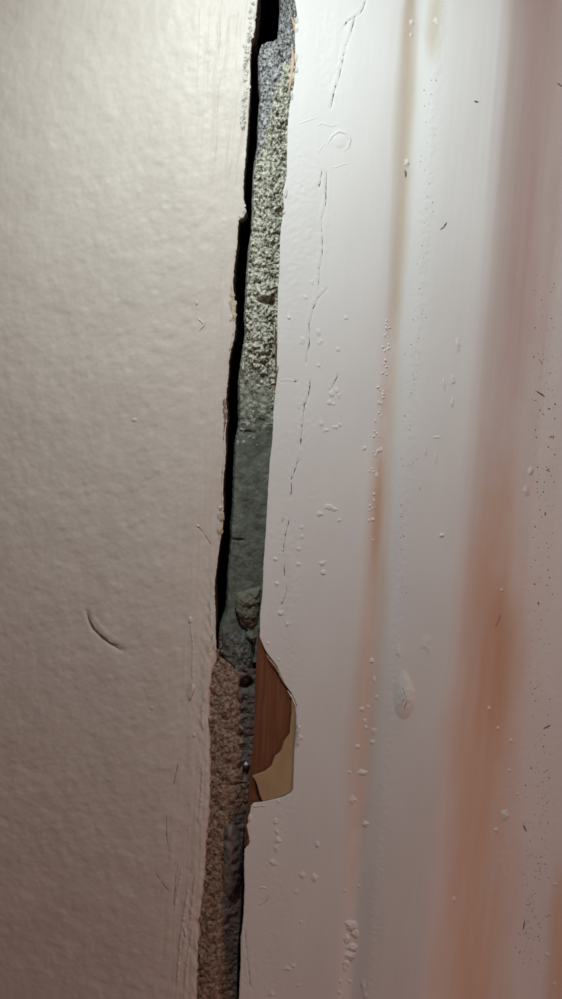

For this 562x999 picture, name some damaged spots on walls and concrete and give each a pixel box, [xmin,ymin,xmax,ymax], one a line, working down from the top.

crack [329,0,365,106]
crack [199,0,279,669]
crack [280,170,337,497]
crack [229,826,251,994]
flaking render [197,598,300,999]